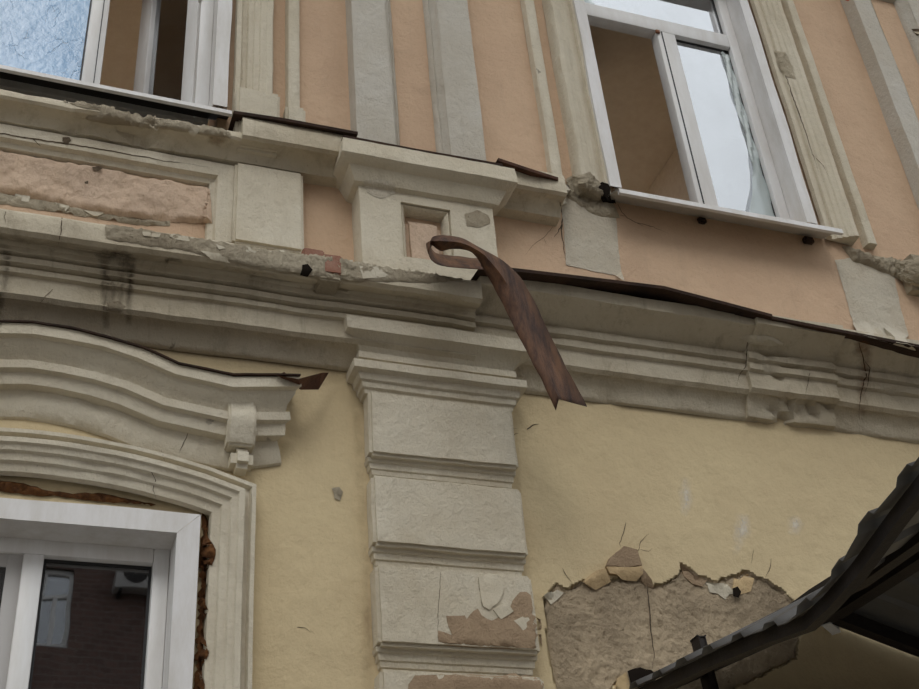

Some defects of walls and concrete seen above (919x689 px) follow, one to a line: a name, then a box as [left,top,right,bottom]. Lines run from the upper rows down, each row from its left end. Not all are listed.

flaking render [63,100,231,139]
flaking render [0,192,189,241]
peeling [201,244,230,263]
crack [529,203,566,259]
crack [859,343,870,409]
flaking render [438,546,799,689]
peeling [408,673,544,689]